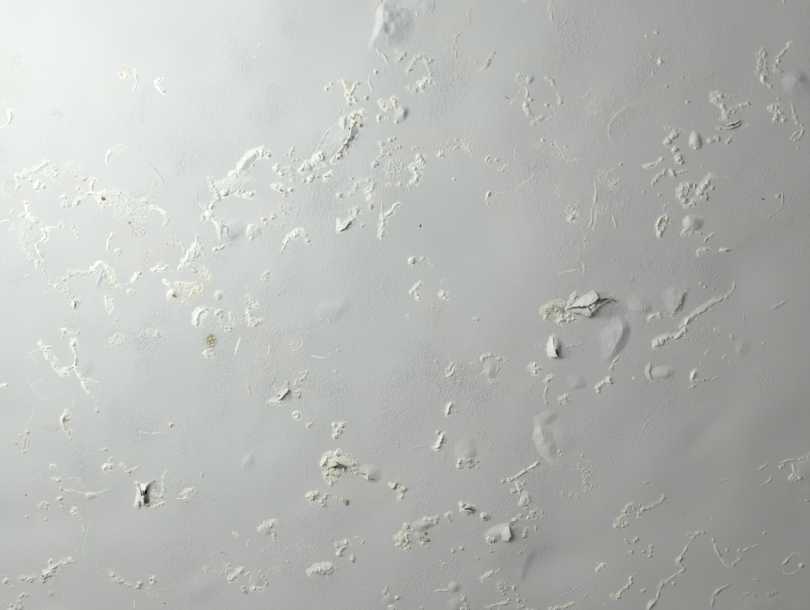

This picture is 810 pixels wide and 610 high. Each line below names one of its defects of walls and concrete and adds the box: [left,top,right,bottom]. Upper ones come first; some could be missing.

peeling [336,204,363,234]
peeling [150,260,177,302]
peeling [546,336,559,357]
peeling [319,448,362,487]
peeling [133,469,202,510]